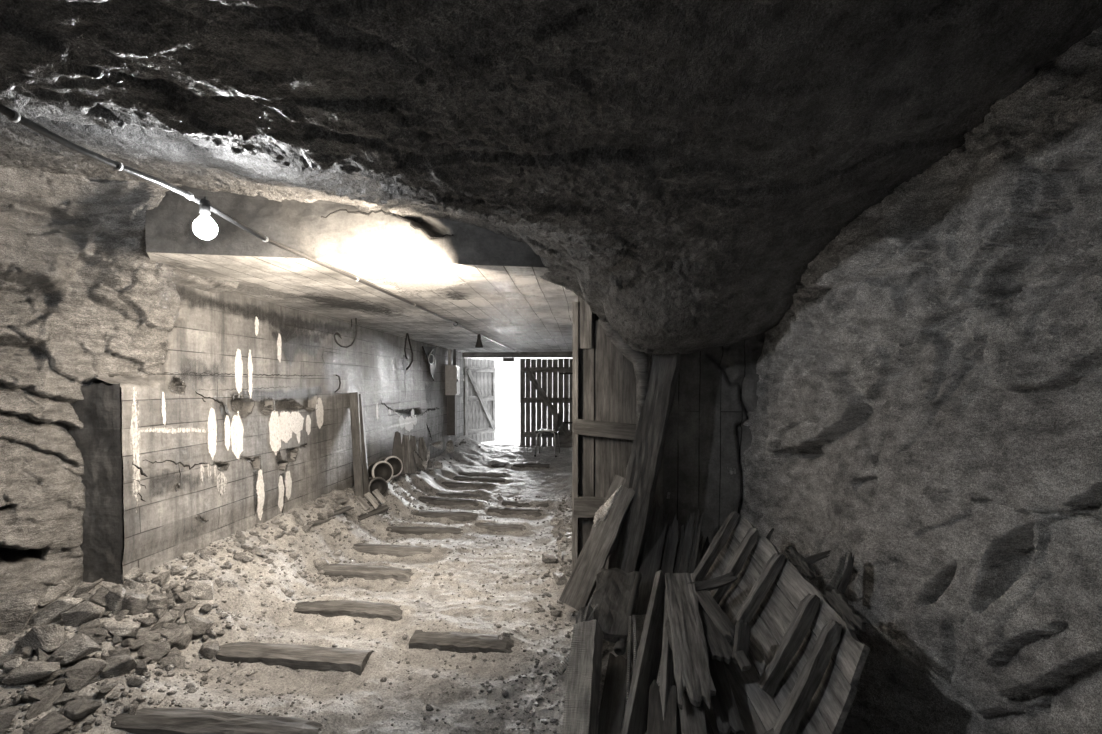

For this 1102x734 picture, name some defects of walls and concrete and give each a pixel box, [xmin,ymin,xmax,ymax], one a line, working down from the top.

crack [321,209,453,239]
spalling [169,375,187,395]
spalling [230,393,318,419]
crack [131,460,209,502]
spalling [213,461,230,472]
spalling [275,443,307,472]